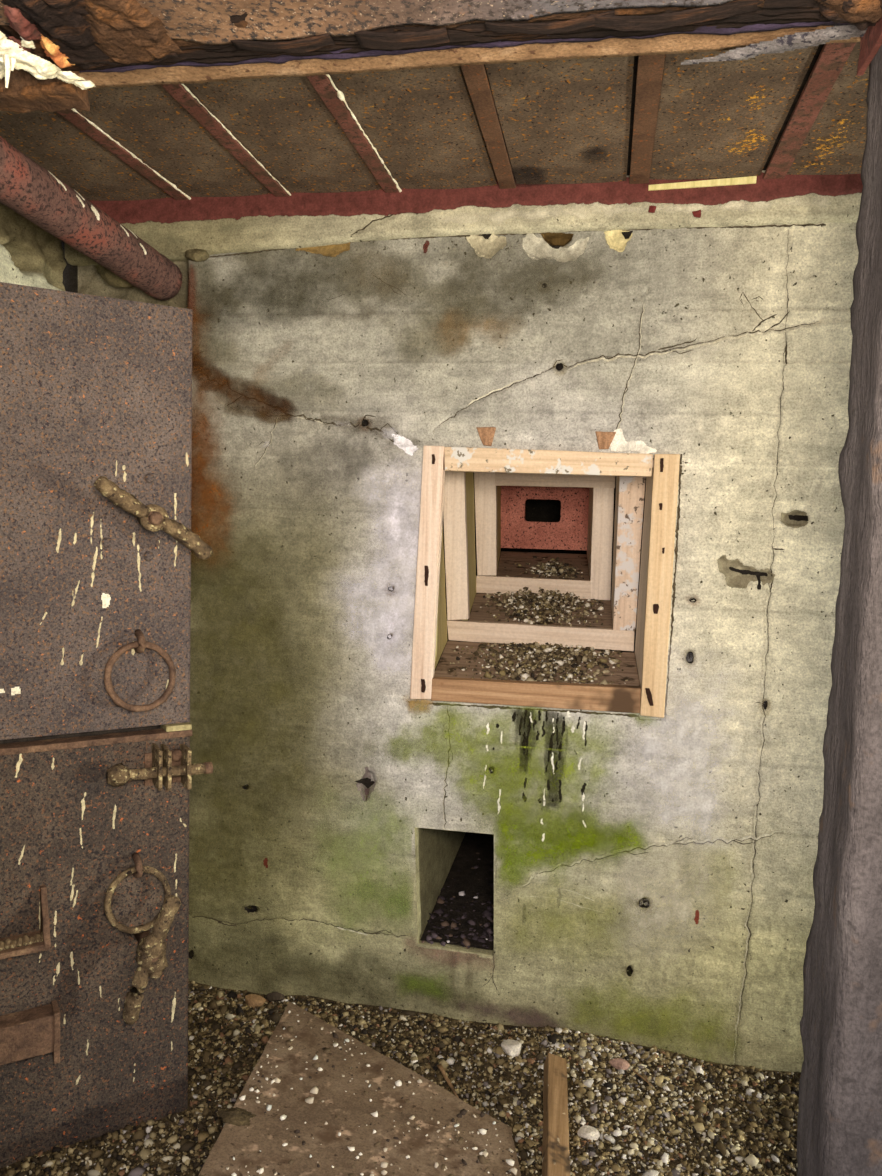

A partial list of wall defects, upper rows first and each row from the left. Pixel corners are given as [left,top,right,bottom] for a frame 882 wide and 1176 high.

peeling [3,6,75,69]
rust [715,123,773,156]
rust [796,115,860,172]
peeling [89,172,863,224]
spalling [521,232,589,262]
spalling [604,230,633,252]
rust [191,348,292,565]
crack [227,403,416,464]
spalling [717,555,775,590]
crack [441,231,819,1064]
damp [486,710,588,842]
crack [189,913,411,937]